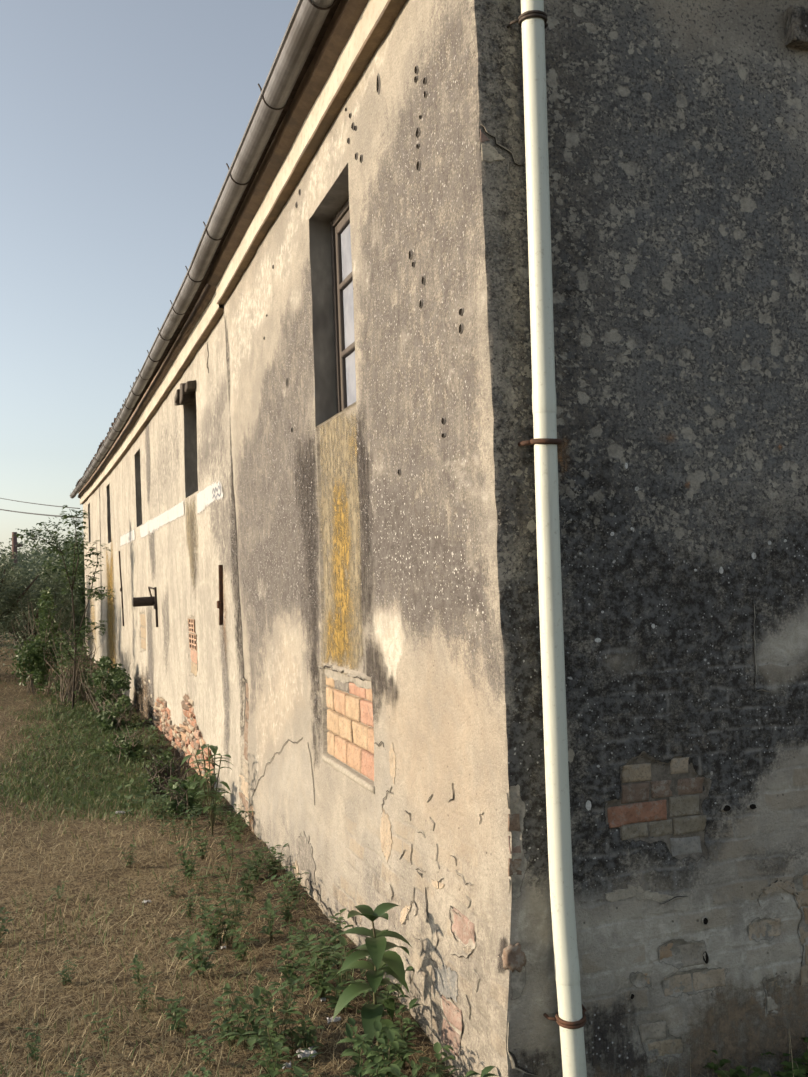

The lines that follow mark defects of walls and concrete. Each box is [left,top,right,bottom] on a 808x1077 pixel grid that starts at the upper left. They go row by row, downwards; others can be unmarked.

crack [480,124,525,181]
water stain [356,410,372,625]
water stain [294,439,327,765]
water stain [363,641,398,719]
flaking render [605,751,712,862]
peeling [605,884,674,903]
flaking render [763,872,808,986]